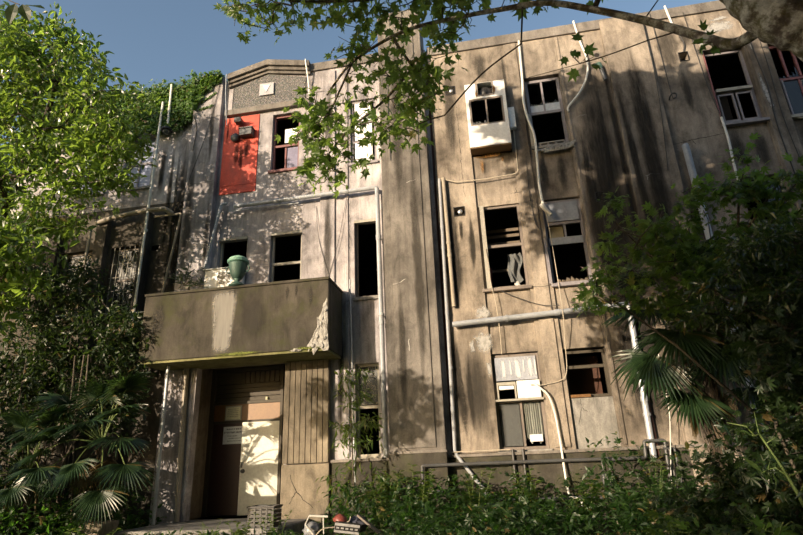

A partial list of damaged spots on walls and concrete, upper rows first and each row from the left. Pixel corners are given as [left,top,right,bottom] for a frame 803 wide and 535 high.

leakage [657,34,686,66]
leakage [234,134,248,168]
leakage [393,82,401,179]
leakage [158,152,195,292]
leakage [411,174,424,350]
leakage [583,67,671,413]
leakage [212,292,236,351]
spalling [290,299,329,355]